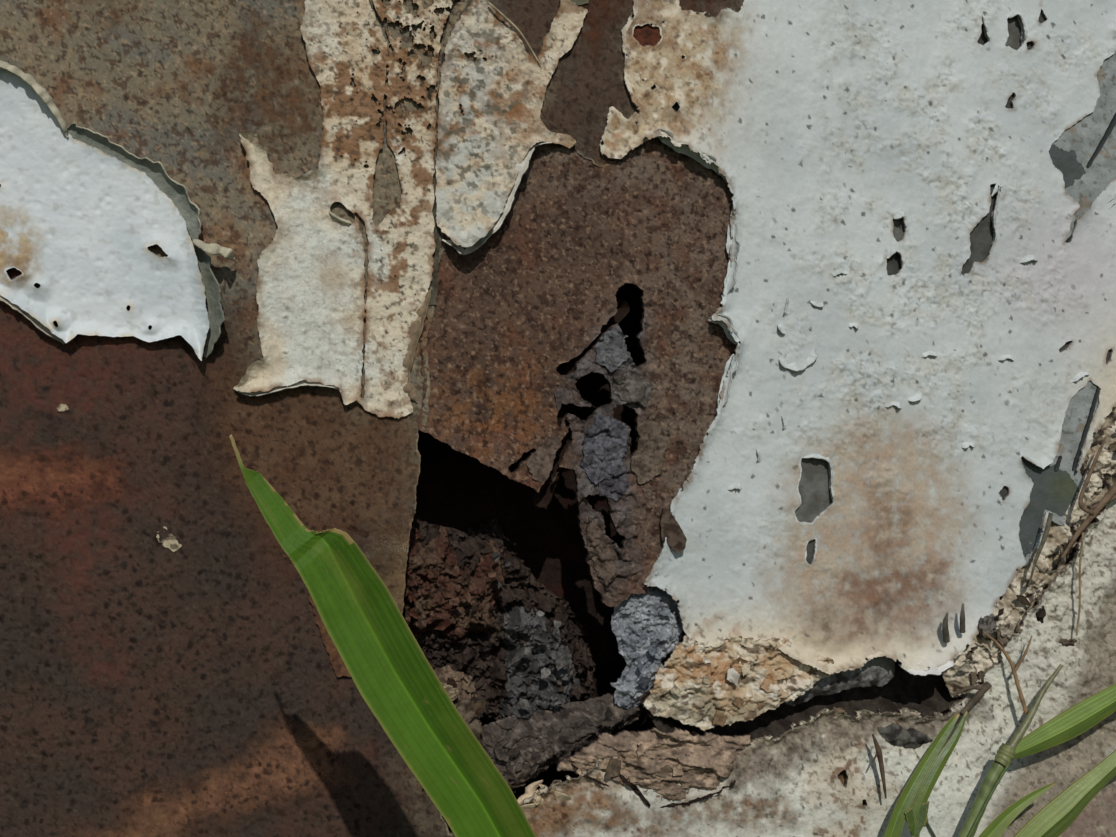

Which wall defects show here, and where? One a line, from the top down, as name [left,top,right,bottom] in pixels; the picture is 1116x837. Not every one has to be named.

peeling [0,60,235,361]
peeling [234,0,589,419]
peeling [961,182,1003,274]
peeling [1049,50,1116,243]
corrosion [0,0,740,837]
peeling [795,453,835,523]
corrosion [784,424,960,636]
crack [999,407,1116,608]
peeling [1019,371,1100,566]
peeling [643,633,835,731]
crack [638,656,983,749]
corrosion [707,797,786,821]